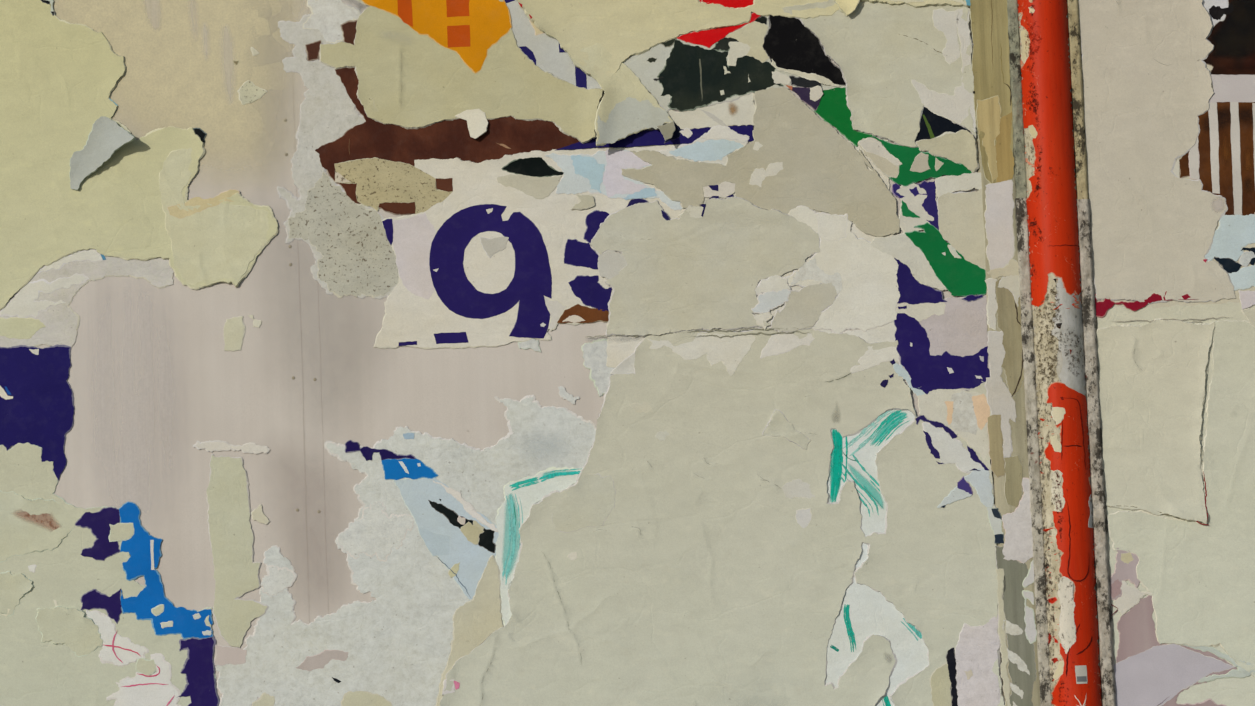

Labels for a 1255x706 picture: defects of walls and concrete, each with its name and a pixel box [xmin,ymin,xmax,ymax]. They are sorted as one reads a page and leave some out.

peeling [341,20,357,45]
peeling [305,40,322,61]
peeling [1020,29,1030,64]
peeling [455,109,488,139]
peeling [910,152,944,173]
peeling [108,523,134,542]
peeling [151,604,173,629]